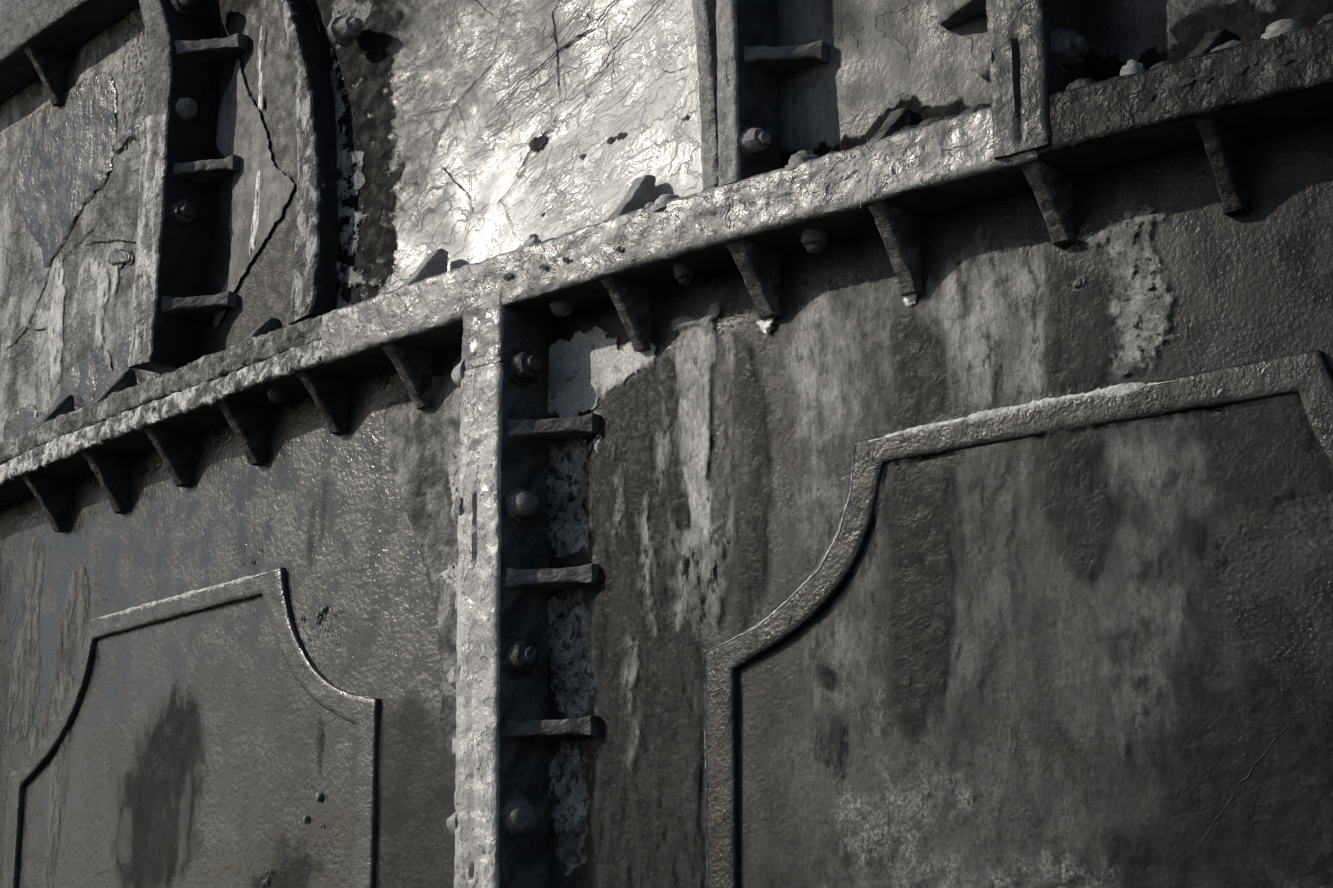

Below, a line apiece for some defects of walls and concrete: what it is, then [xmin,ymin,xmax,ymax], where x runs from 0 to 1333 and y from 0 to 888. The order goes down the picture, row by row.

peeling [14,71,144,269]
peeling [309,0,417,305]
crack [414,0,660,237]
leakage [7,535,286,888]
peeling [383,367,461,759]
peeling [548,326,656,418]
leakage [547,205,1179,888]
leakage [756,393,1333,888]